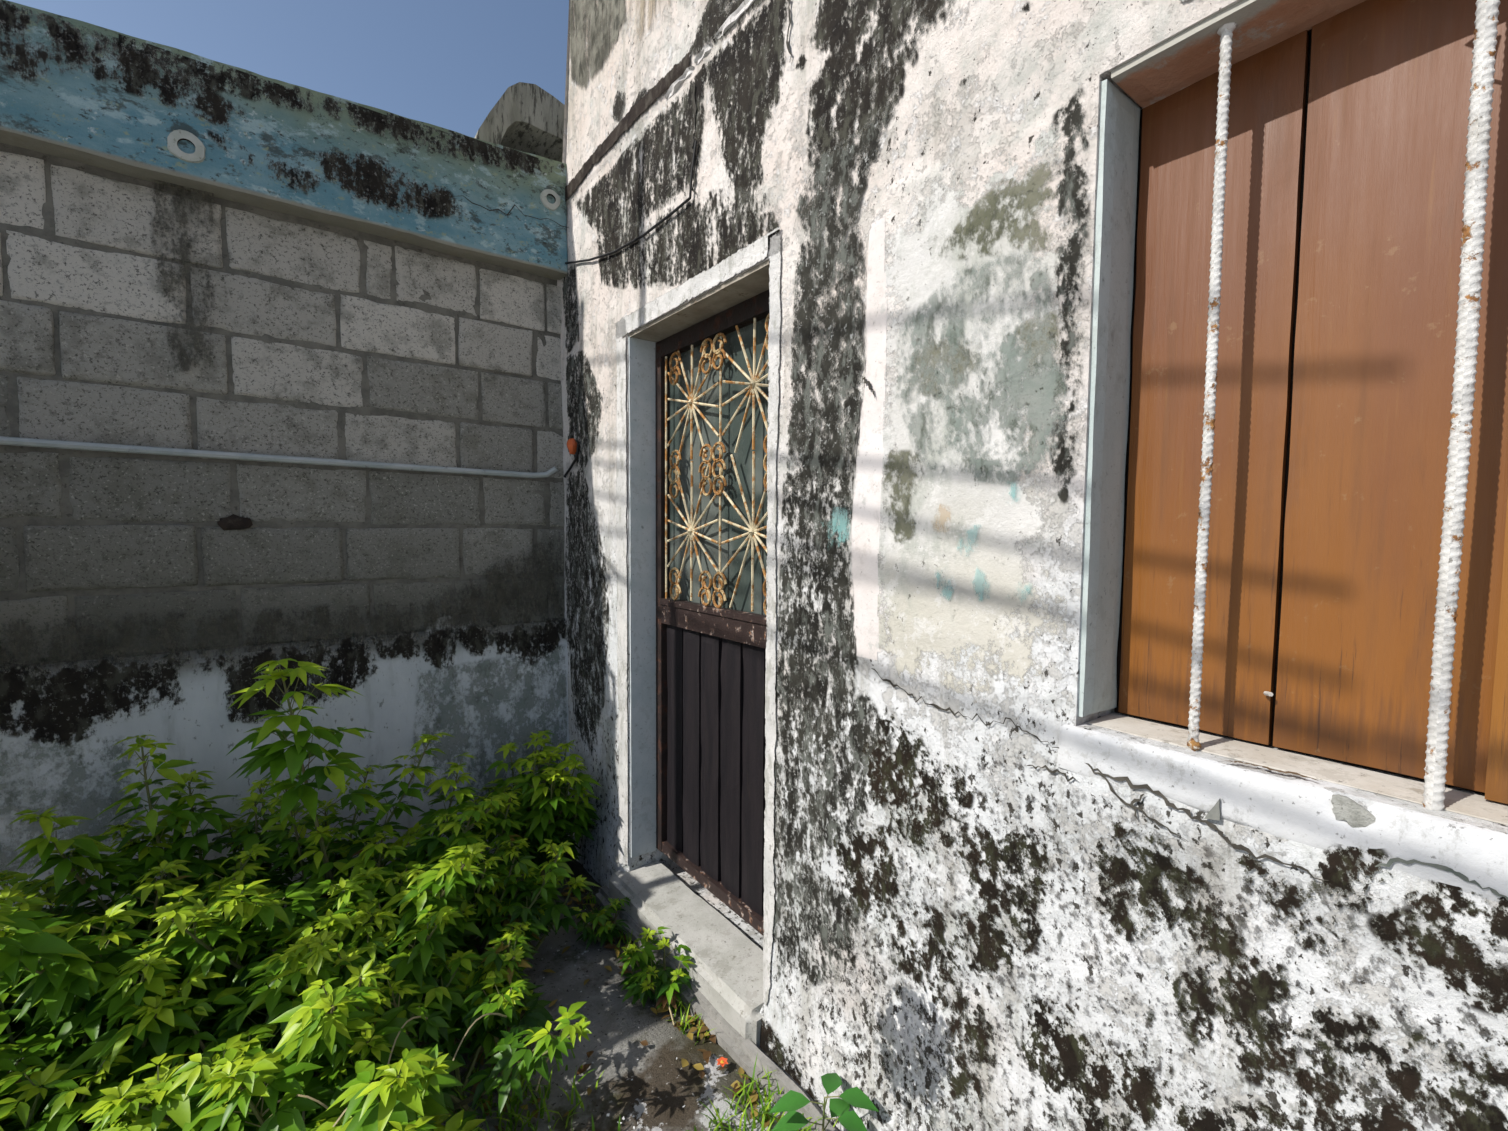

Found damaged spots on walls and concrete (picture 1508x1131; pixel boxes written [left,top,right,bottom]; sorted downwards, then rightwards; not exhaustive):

damp [0,0,564,218]
damp [569,0,1508,1131]
damp [0,537,568,874]
crack [871,668,1329,881]
crack [1375,857,1508,901]